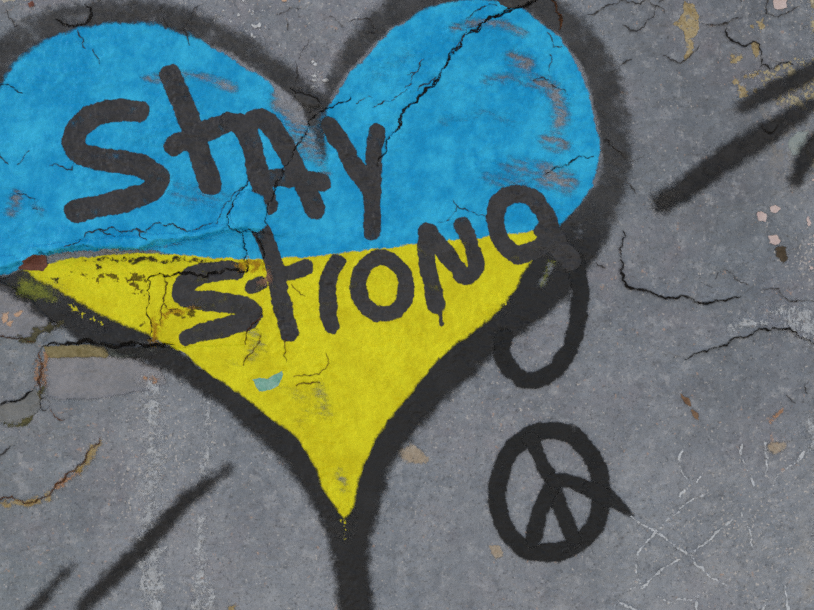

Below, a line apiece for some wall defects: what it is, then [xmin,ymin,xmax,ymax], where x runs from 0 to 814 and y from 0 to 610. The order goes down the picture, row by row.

crack [587,0,665,32]
peeling [773,0,787,10]
crack [702,0,793,76]
peeling [773,80,814,108]
peeling [788,130,808,155]
crack [0,0,566,421]
peeling [757,205,781,222]
peeling [768,235,788,263]
crack [596,231,806,305]
spalling [0,286,57,338]
crack [685,327,814,360]
crack [0,437,101,504]